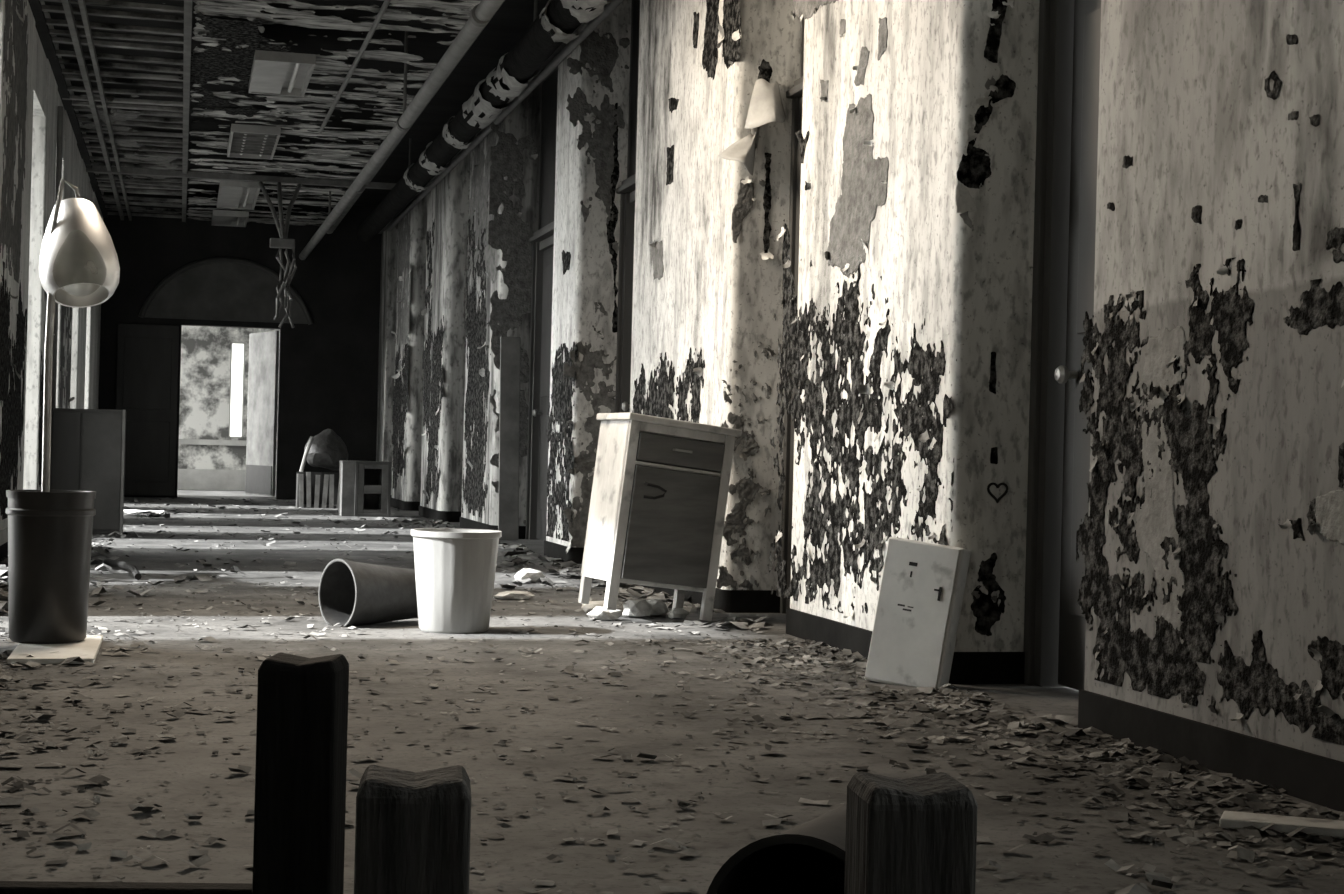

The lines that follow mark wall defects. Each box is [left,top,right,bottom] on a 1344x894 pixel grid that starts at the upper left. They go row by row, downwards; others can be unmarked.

peeling [0,0,75,520]
peeling [391,214,444,504]
peeling [460,122,538,518]
flaking render [562,250,571,275]
peeling [546,302,616,554]
peeling [566,30,630,260]
peeling [632,347,705,423]
peeling [702,0,741,80]
peeling [716,17,957,618]
peeling [955,0,1016,229]
peeling [1076,258,1344,745]
flaking render [1292,183,1302,251]